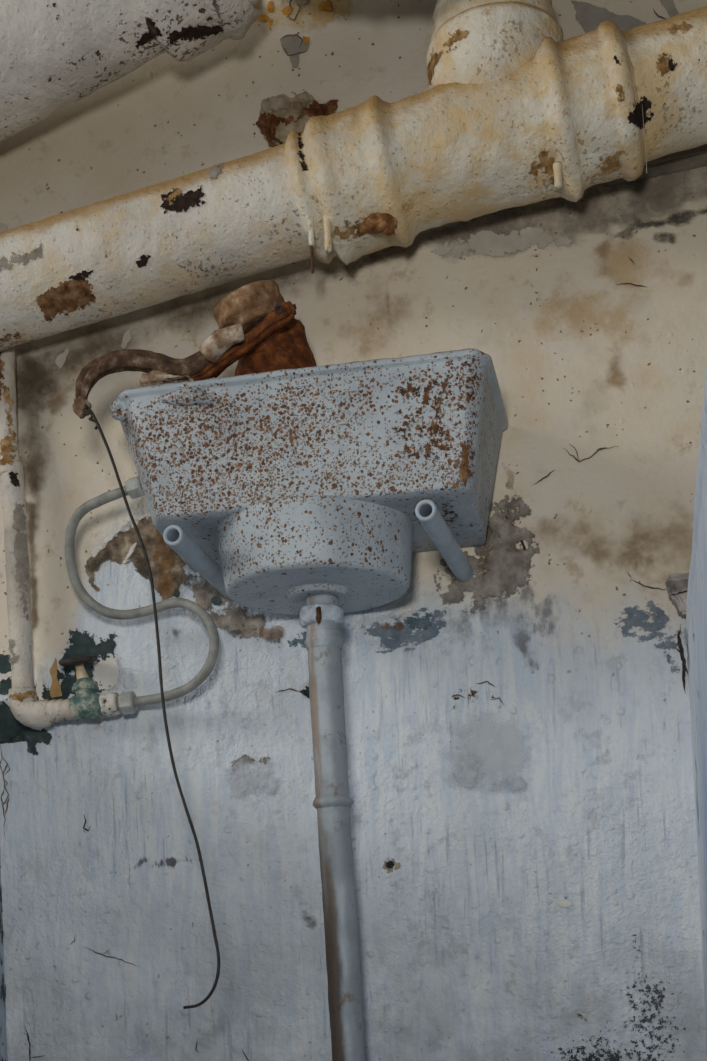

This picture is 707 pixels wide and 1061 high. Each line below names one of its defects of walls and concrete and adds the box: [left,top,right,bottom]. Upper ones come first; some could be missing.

flaking render [256,91,338,171]
peeling [85,512,307,648]
peeling [364,495,540,654]
peeling [0,647,59,756]
peeling [34,628,121,700]
flaking render [516,631,532,666]
mould [547,934,686,1061]